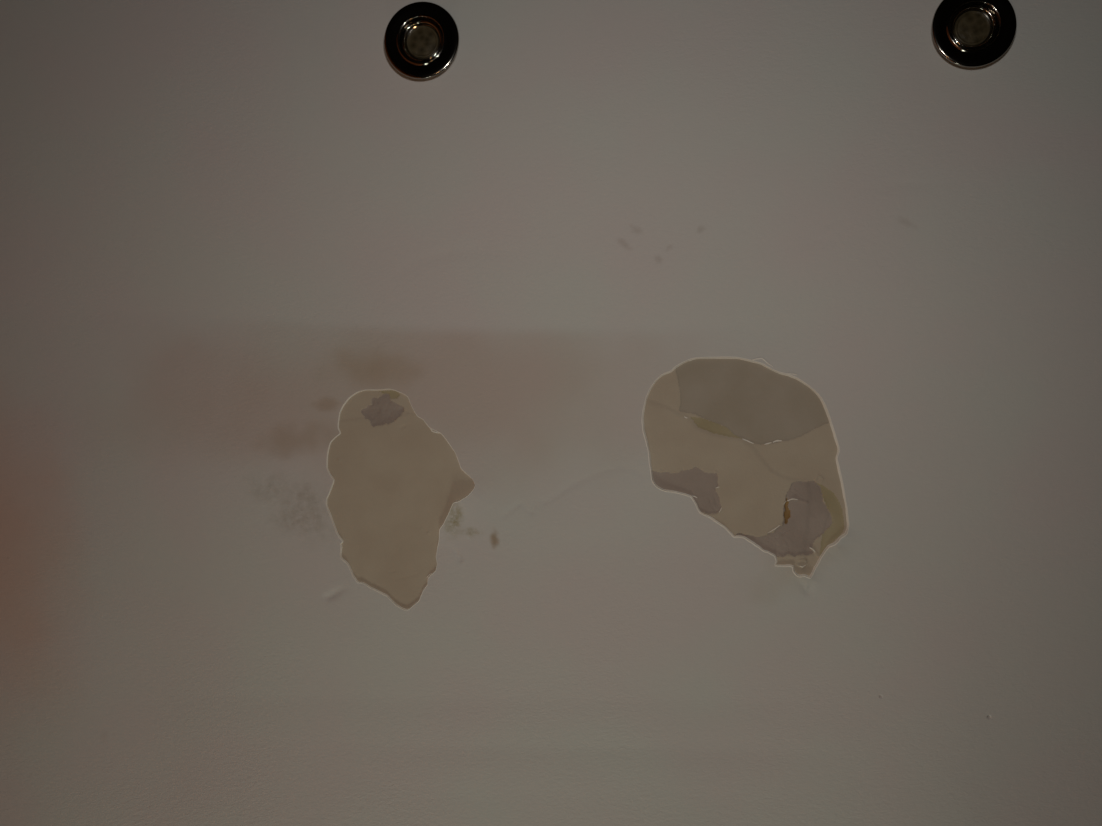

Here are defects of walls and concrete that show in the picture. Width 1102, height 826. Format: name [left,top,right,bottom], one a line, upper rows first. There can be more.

peeling [326,389,475,610]
peeling [641,356,849,579]